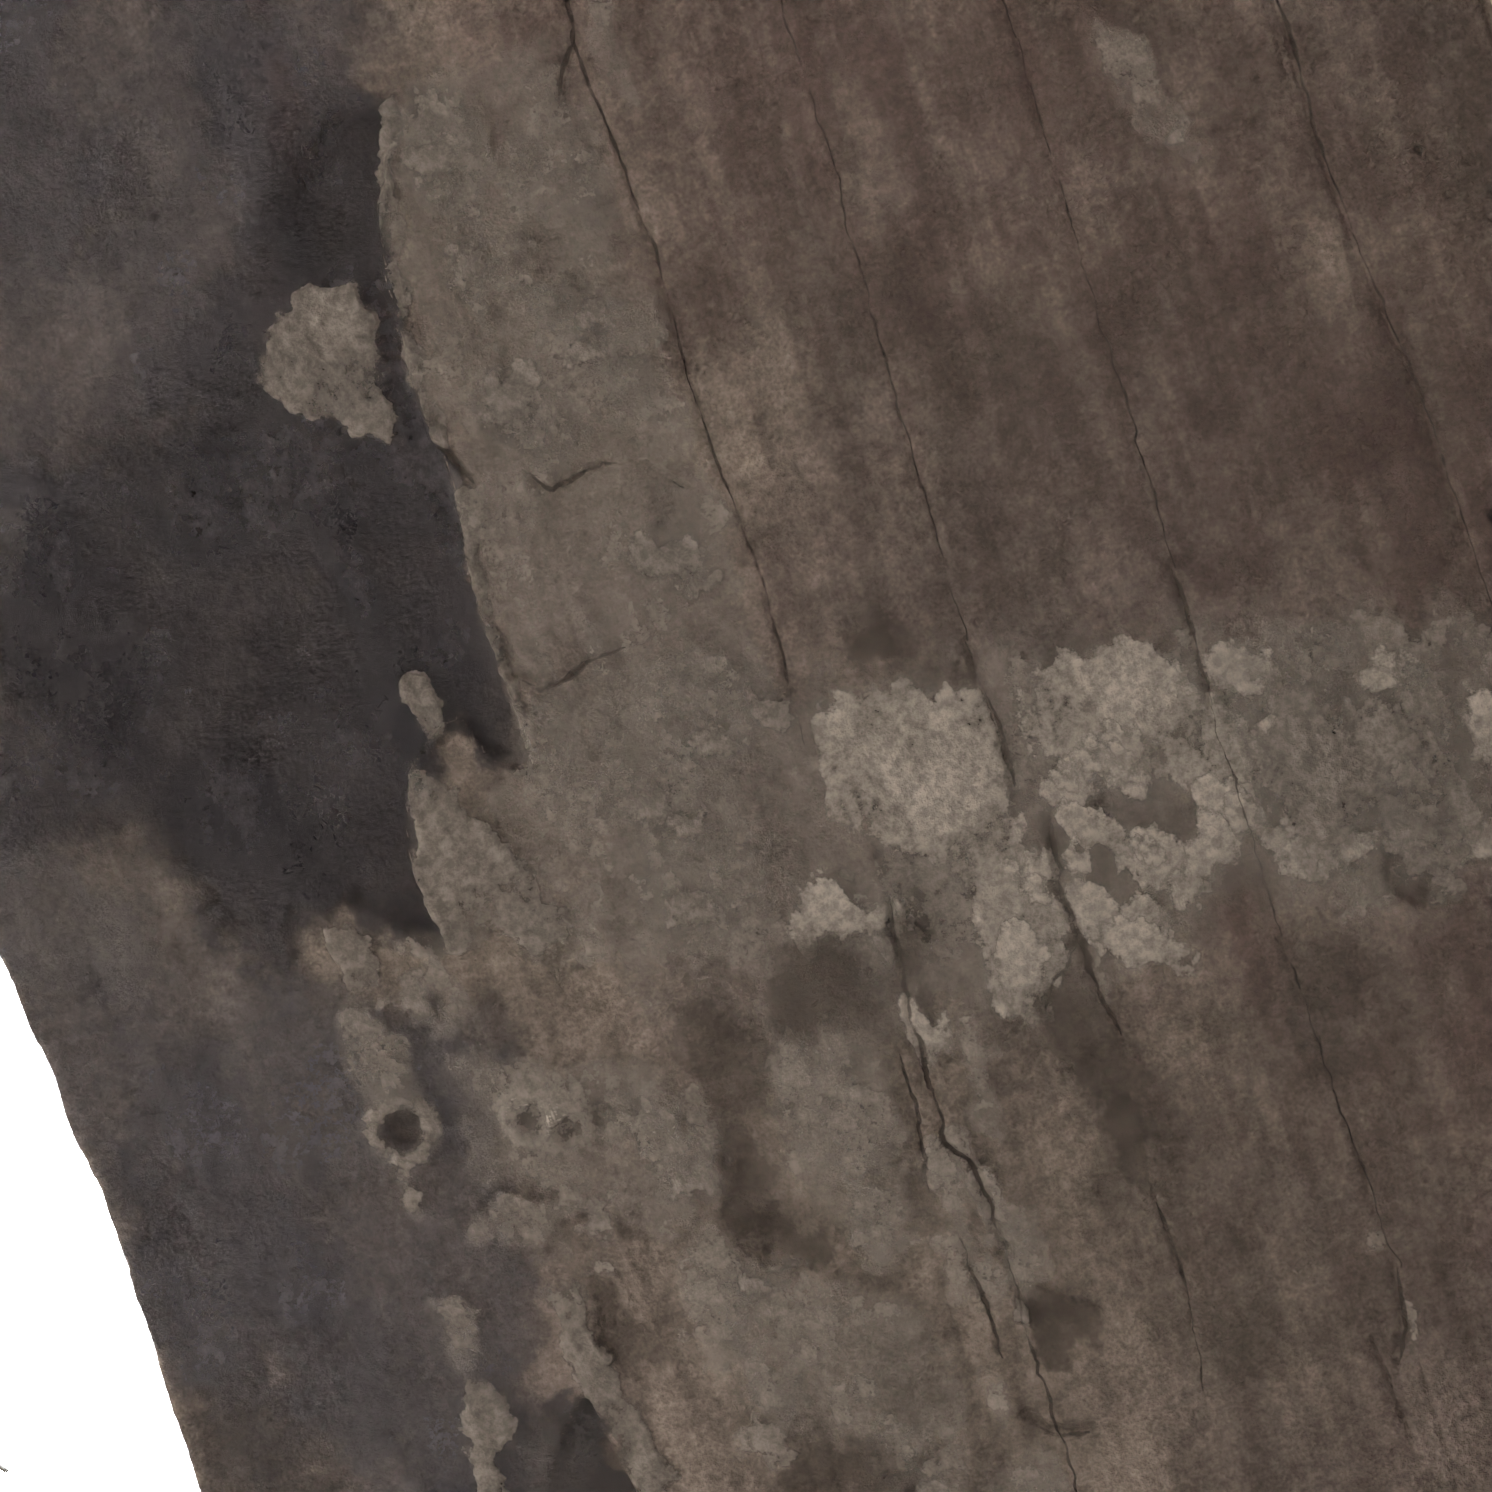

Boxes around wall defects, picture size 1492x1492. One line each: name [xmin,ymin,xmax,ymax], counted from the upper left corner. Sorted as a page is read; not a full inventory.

peeling [257,95,449,463]
spalling [454,485,520,710]
crack [558,0,662,277]
crack [673,318,734,501]
crack [781,0,942,553]
crack [1002,0,1281,932]
peeling [323,922,380,997]
water stain [0,0,732,1492]
peeling [399,670,576,957]
crack [1045,823,1122,1035]
crack [889,897,1090,1492]
spalling [544,1280,682,1492]